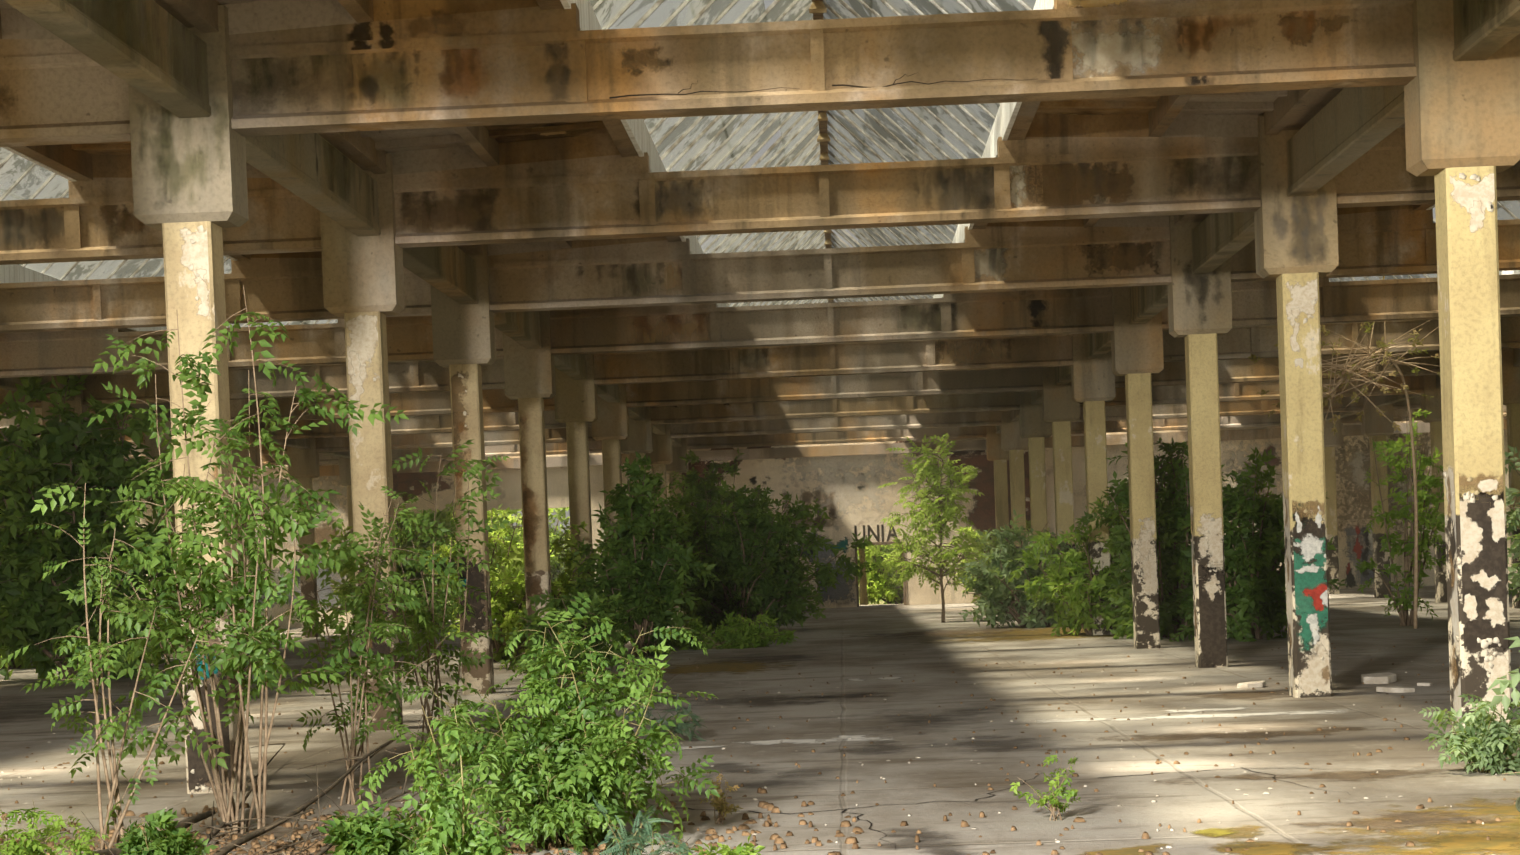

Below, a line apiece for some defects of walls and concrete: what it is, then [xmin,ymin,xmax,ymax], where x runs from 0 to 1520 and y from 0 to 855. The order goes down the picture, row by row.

water stain [347,22,394,50]
water stain [1039,0,1163,79]
peeling [1136,516,1157,596]
peeling [1190,421,1510,740]